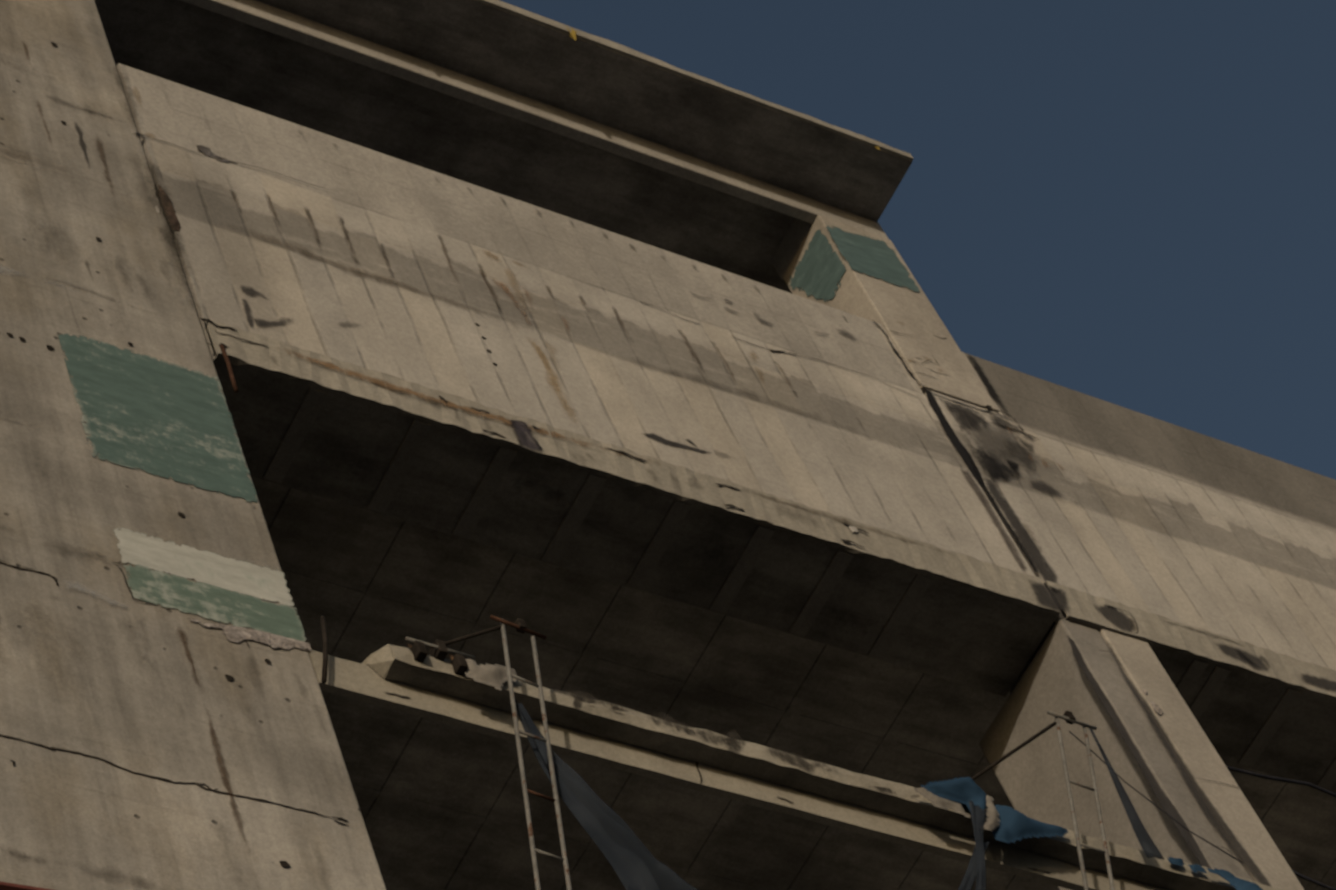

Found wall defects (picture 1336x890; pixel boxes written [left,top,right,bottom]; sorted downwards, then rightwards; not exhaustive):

corrosion [295,353,512,426]
leakage [924,356,1067,610]
crack [0,550,59,586]
crack [0,720,350,826]